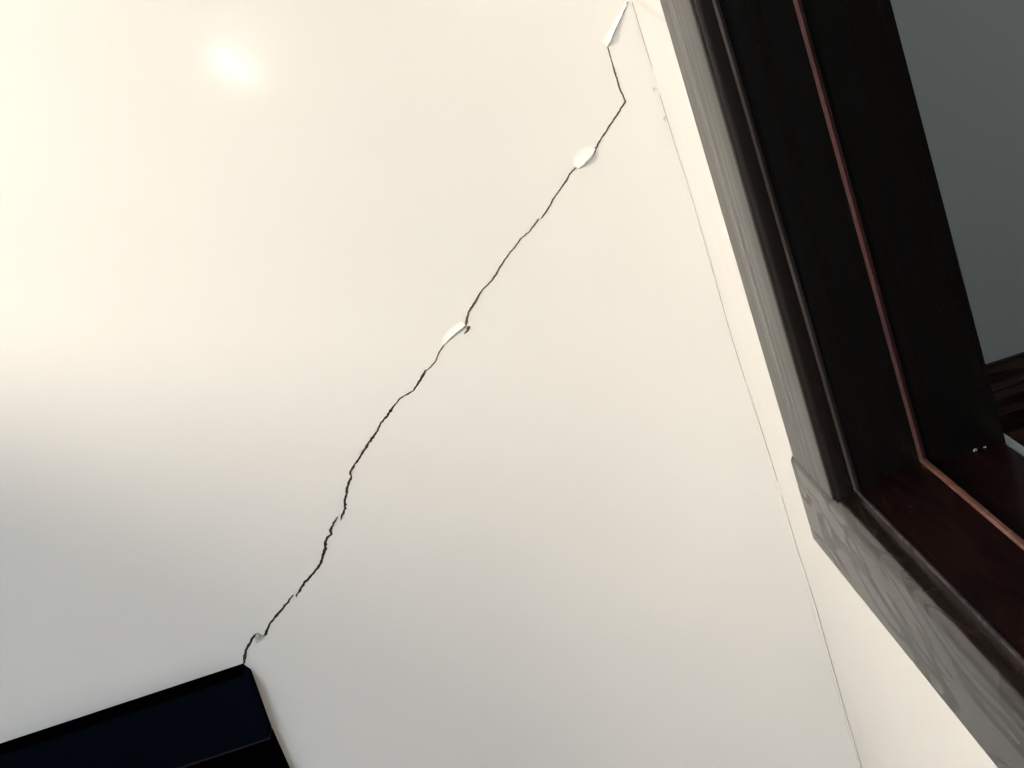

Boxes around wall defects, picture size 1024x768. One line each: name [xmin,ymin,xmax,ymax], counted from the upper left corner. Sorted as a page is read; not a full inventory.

peeling [603,2,627,47]
peeling [573,146,595,169]
crack [242,2,652,663]
peeling [441,320,466,348]
crack [659,94,862,768]